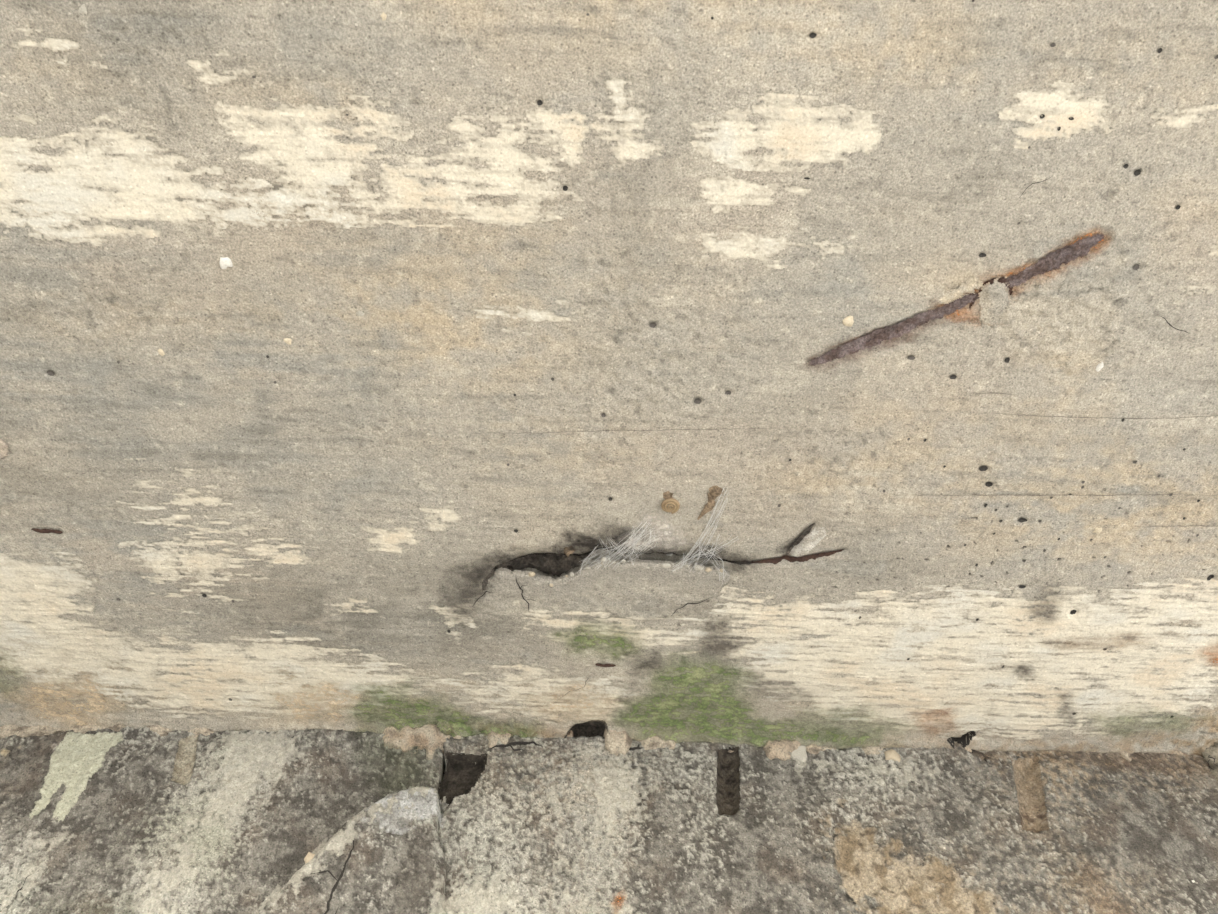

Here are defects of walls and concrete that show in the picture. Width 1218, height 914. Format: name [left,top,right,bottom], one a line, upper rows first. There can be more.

peeling [91,114,121,125]
peeling [563,186,584,202]
crack [472,523,844,621]
crack [310,840,354,914]